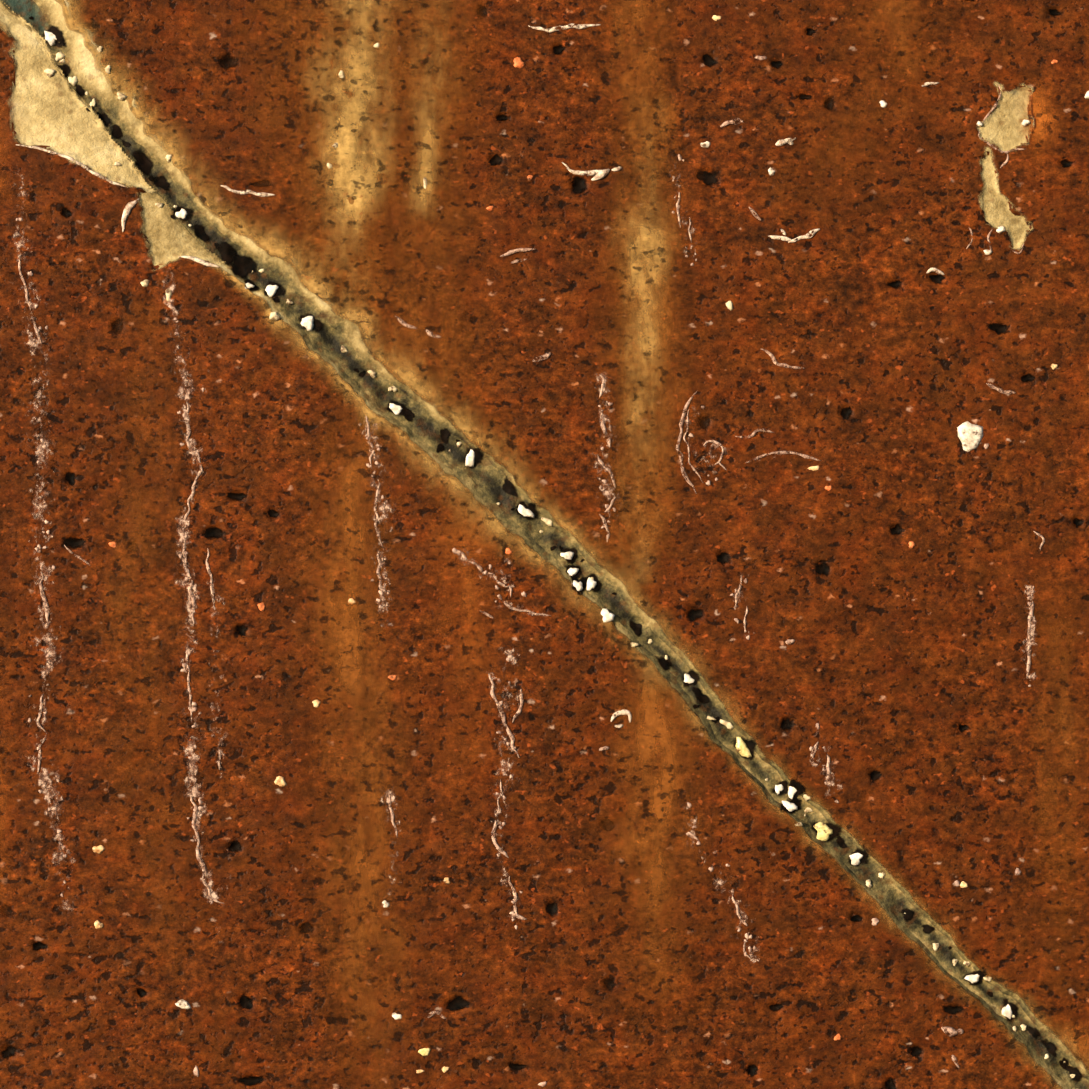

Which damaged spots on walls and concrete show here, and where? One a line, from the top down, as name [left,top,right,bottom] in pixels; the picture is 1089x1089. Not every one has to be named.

peeling [0,1,224,268]
leakage [163,273,194,421]
spalling [220,54,238,69]
crack [33,0,497,455]
crack [75,81,801,814]
peeling [977,82,1033,255]
rust [1029,90,1053,141]
leakage [28,757,74,863]
leakage [184,738,217,903]
rust [315,430,400,996]
rust [620,682,691,972]
crack [785,780,1089,1089]